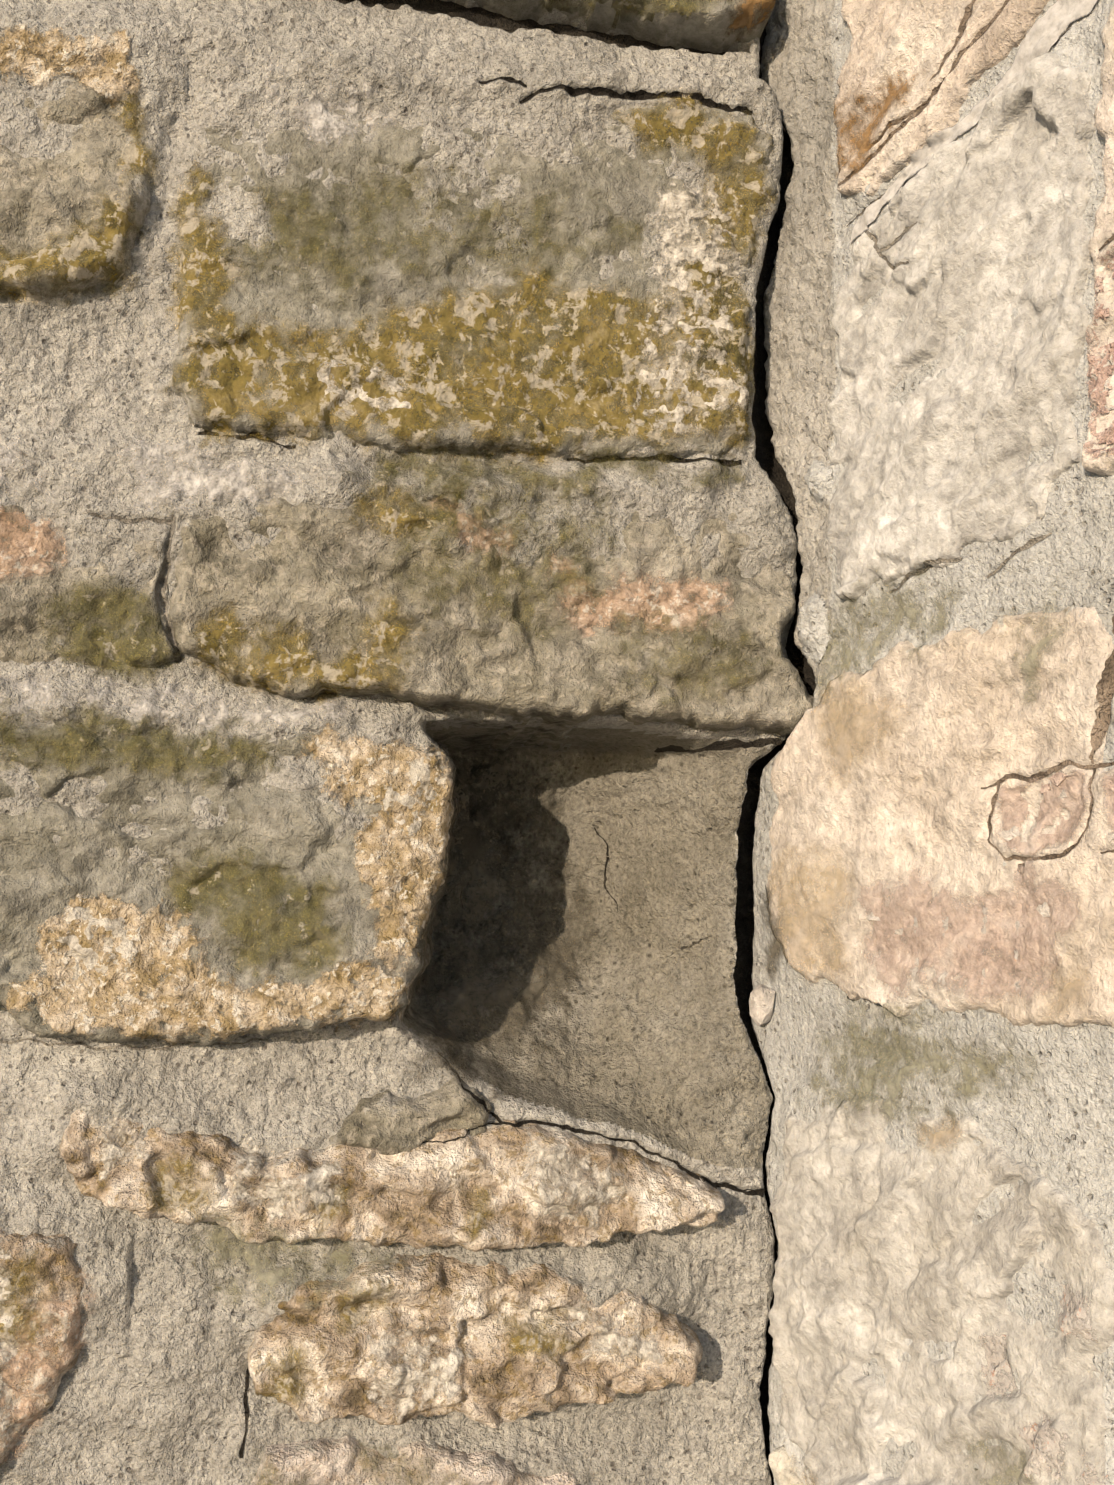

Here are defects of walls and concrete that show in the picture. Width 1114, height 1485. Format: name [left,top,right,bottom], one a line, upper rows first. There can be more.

crack [336,0,816,697]
crack [198,429,296,449]
crack [90,512,181,661]
crack [981,615,1114,879]
crack [0,1038,264,1051]
crack [422,738,787,1485]
crack [239,1368,250,1458]